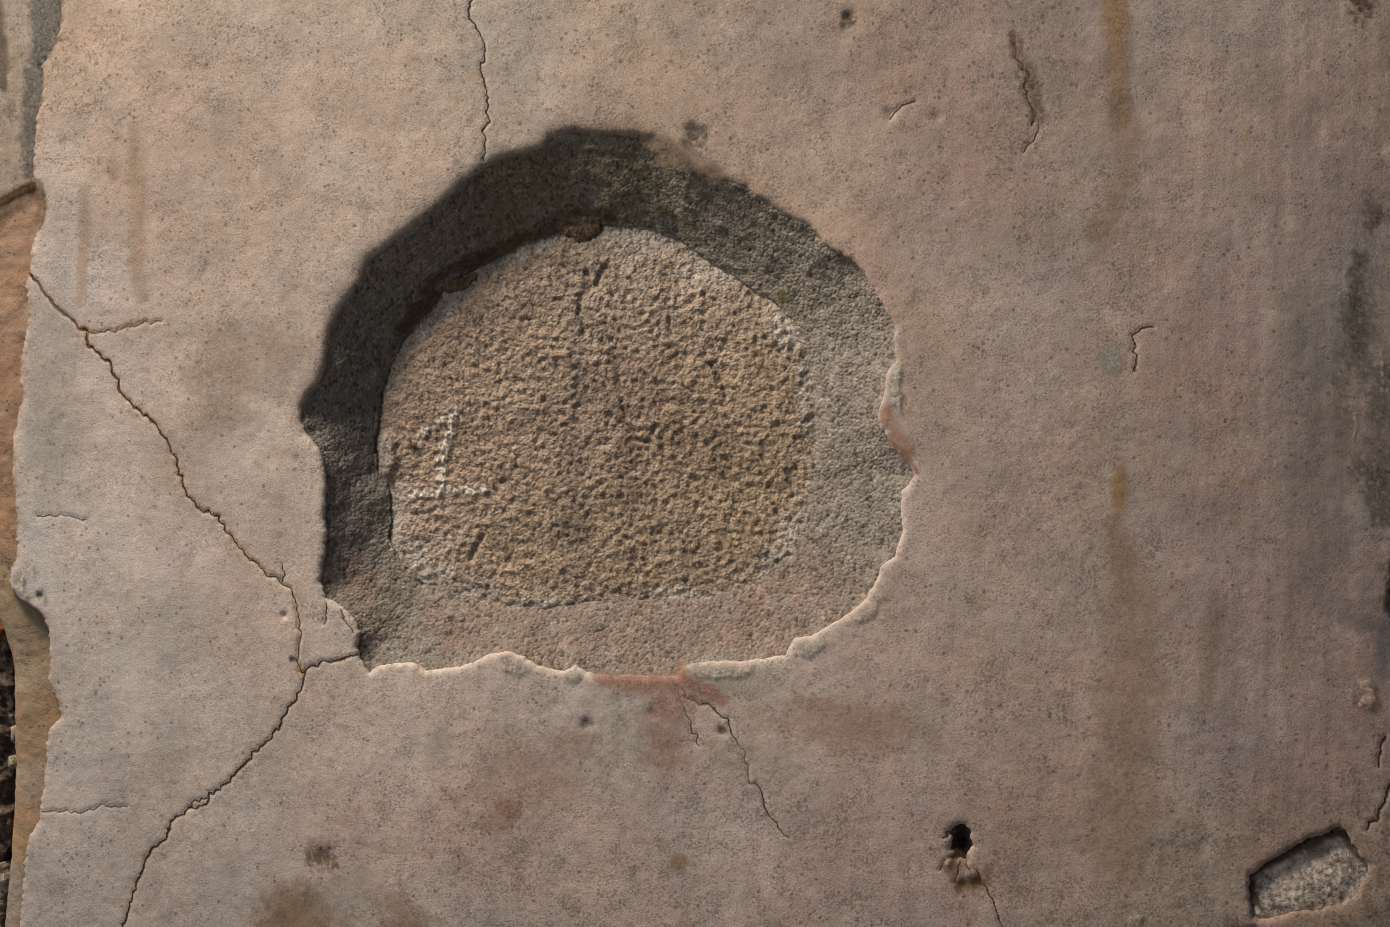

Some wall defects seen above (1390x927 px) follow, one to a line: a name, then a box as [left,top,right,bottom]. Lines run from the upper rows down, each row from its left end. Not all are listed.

damp [22,0,61,178]
crack [468,0,490,159]
spalling [302,133,914,681]
crack [29,272,358,927]
peeling [8,725,17,770]
crack [670,678,788,837]
spalling [1249,827,1368,919]